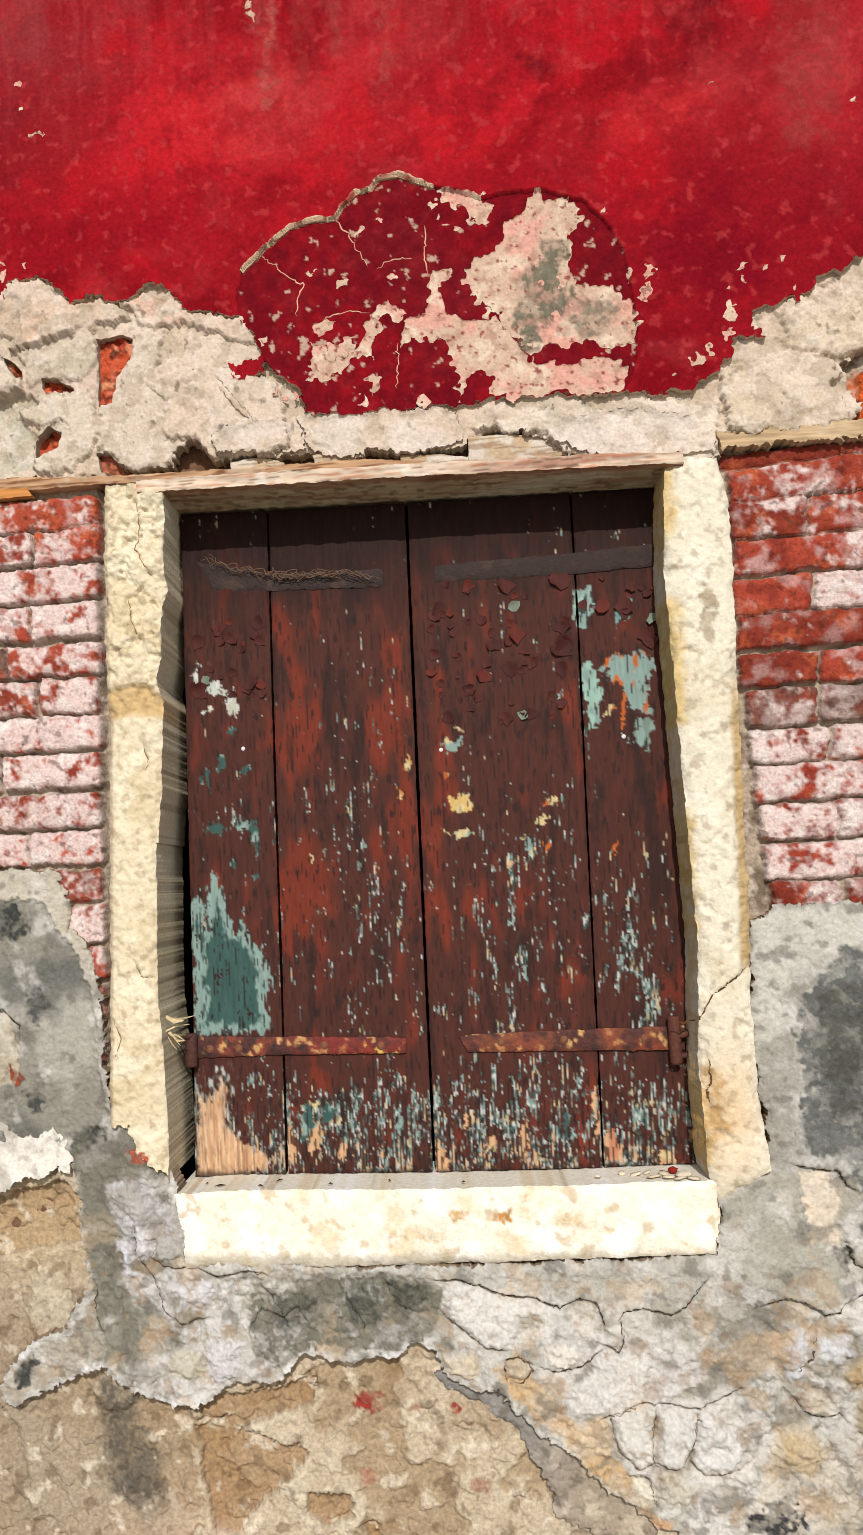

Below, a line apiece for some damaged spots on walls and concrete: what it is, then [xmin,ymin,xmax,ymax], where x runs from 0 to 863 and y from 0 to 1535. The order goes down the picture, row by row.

crack [264,258,361,318]
crack [335,219,428,273]
spalling [45,382,74,393]
spalling [100,338,133,405]
spalling [210,170,863,920]
spalling [0,456,133,1068]
leakage [0,903,30,940]
leakage [26,1095,44,1112]
leakage [791,945,863,1185]
spalling [0,1168,593,1535]
crack [445,1279,705,1384]
crack [598,1390,741,1504]